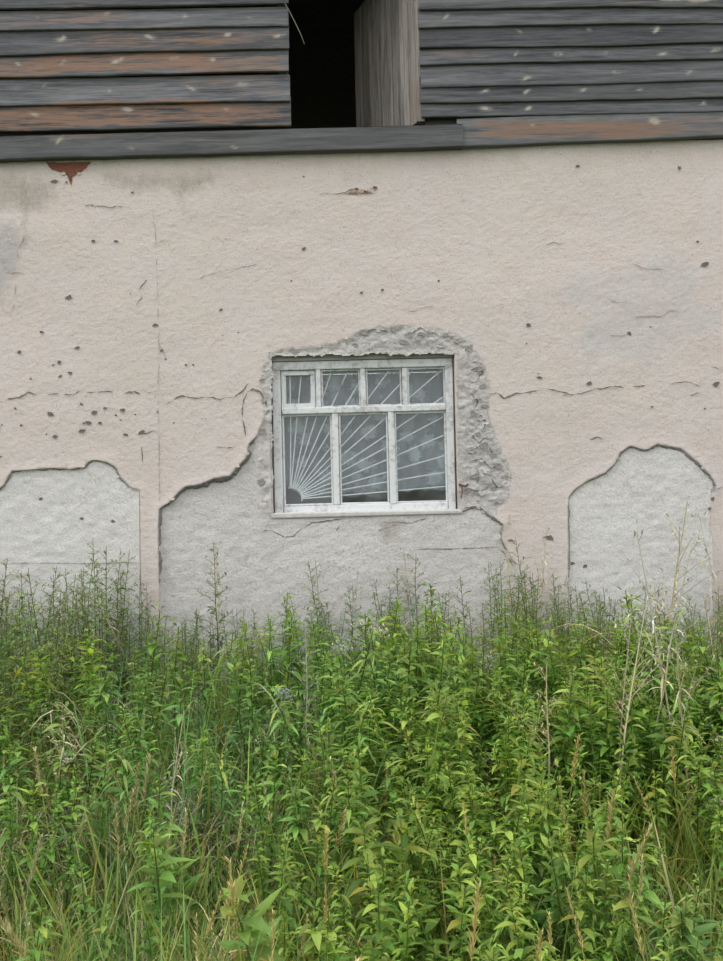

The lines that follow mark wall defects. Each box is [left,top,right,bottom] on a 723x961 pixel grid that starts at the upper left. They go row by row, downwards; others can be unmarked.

flaking render [0,460,141,686]
crack [0,384,267,448]
flaking render [158,325,518,688]
crack [492,385,645,399]
flaking render [568,445,716,673]